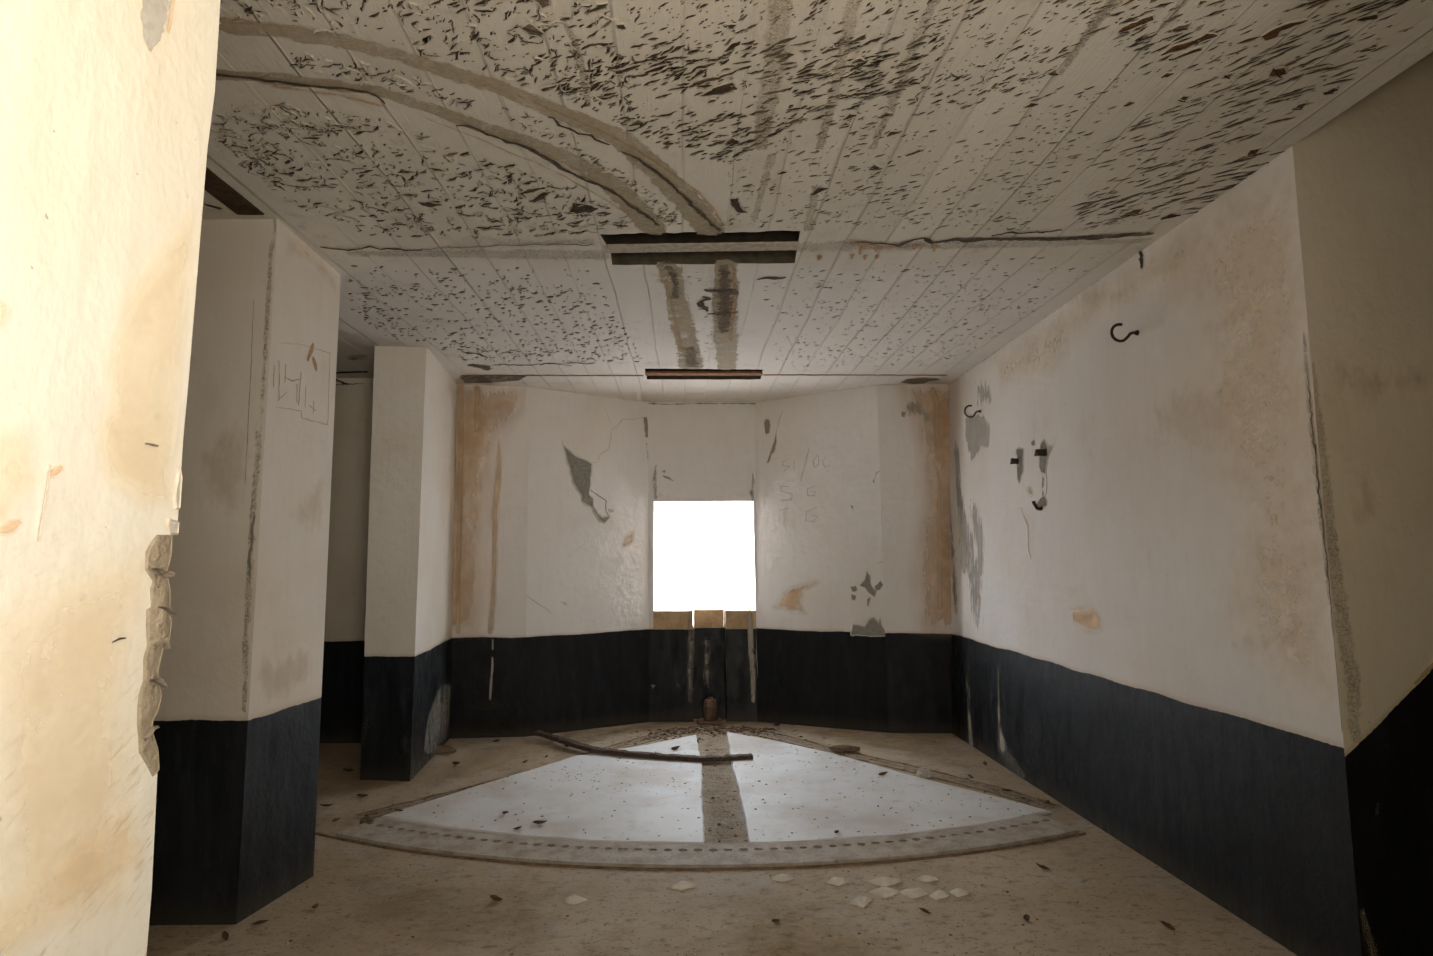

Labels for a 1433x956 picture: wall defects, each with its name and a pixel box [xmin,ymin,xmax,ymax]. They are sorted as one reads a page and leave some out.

flaking render [141,0,174,51]
peeling [209,0,1426,238]
peeling [348,265,642,371]
peeling [688,272,739,362]
peeling [764,257,1099,385]
spalling [137,466,183,777]
peeling [242,435,261,709]
flaking render [562,417,648,524]
flaking render [850,571,885,637]
peeling [1303,335,1357,733]